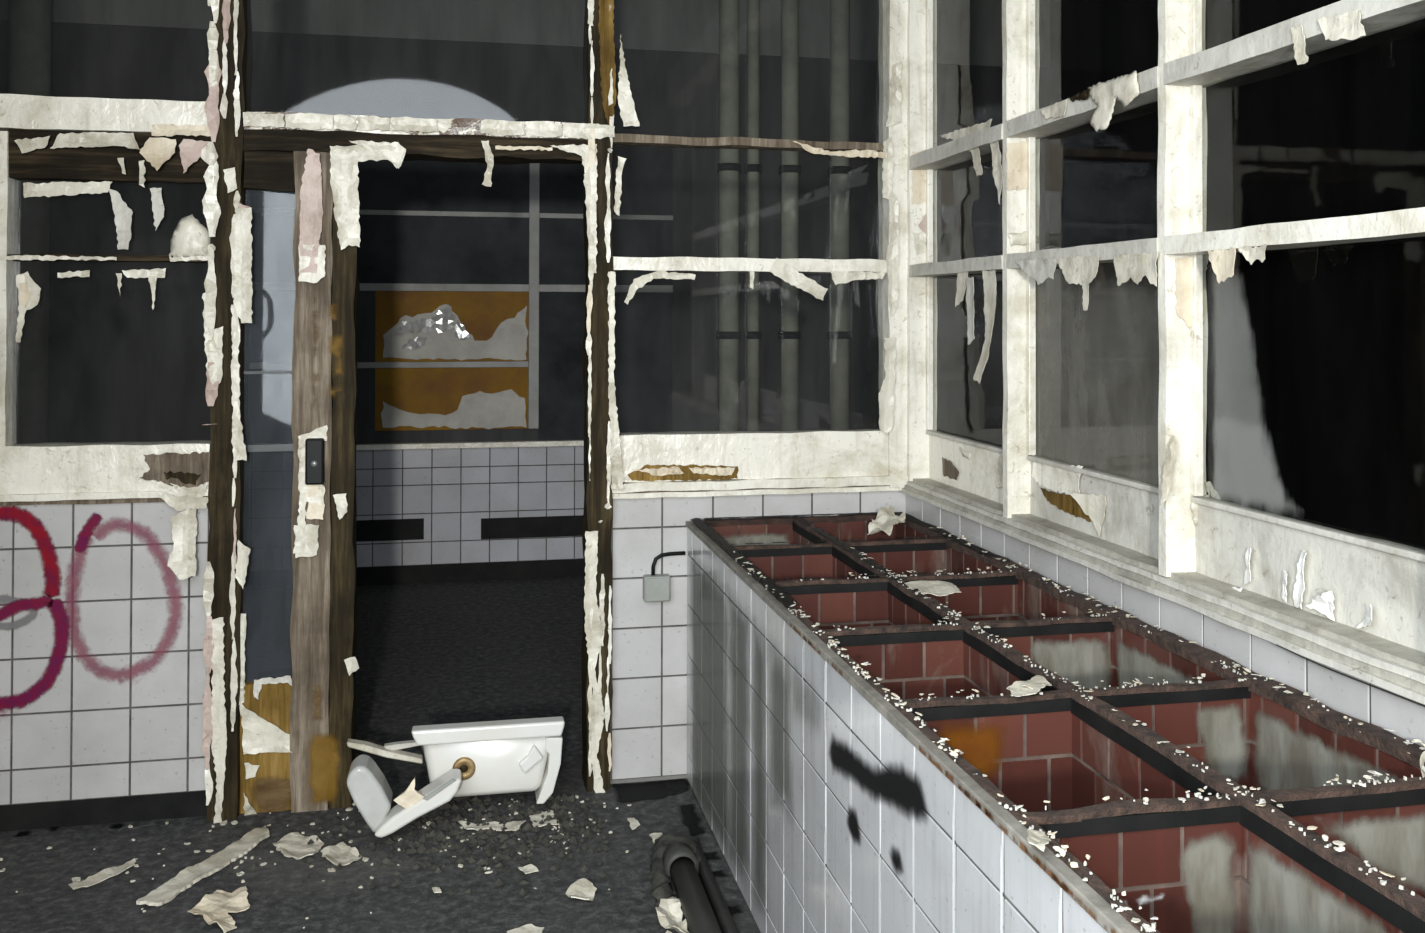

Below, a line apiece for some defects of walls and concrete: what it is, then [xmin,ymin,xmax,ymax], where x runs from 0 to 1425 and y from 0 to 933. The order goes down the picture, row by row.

peeling [955,270,997,384]
peeling [1008,231,1158,311]
peeling [1175,244,1267,330]
peeling [0,0,438,823]
peeling [480,0,739,793]
peeling [733,551,964,762]
peeling [848,547,1168,701]
water stain [693,568,803,888]
peeling [997,793,1093,881]
peeling [1157,741,1345,852]
peeling [1324,729,1425,787]
peeling [1110,889,1158,932]